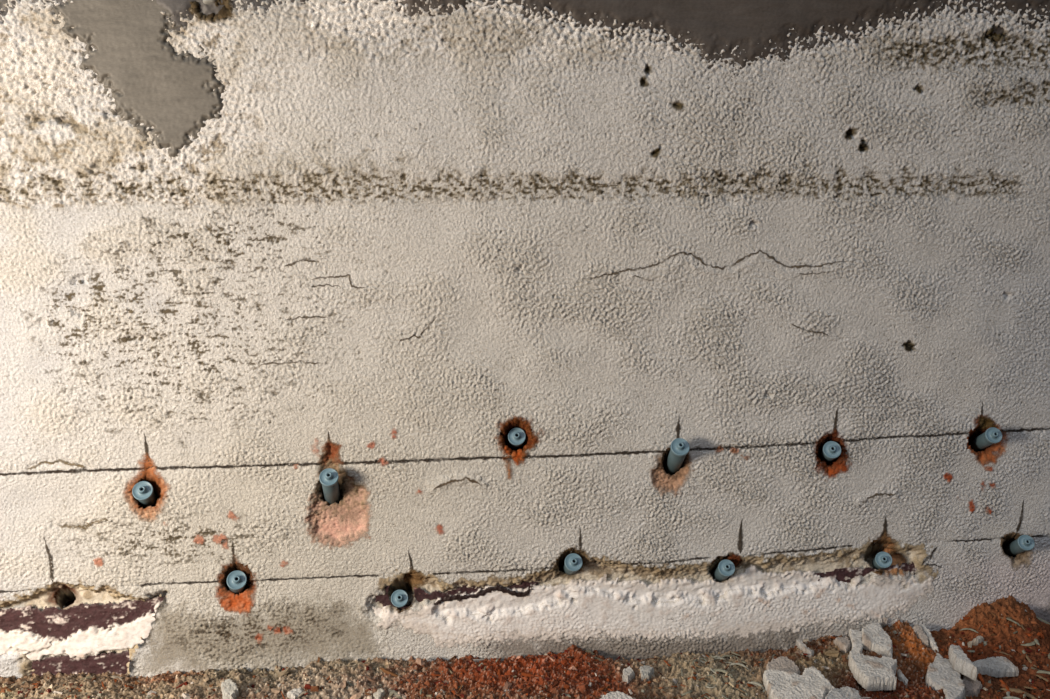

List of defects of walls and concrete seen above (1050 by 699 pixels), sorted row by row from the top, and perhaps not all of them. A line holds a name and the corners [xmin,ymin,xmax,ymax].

hole [189,0,232,22]
crack [586,250,860,281]
rust [313,442,342,463]
rust [495,417,543,479]
rust [817,430,846,469]
flaking render [0,580,167,678]